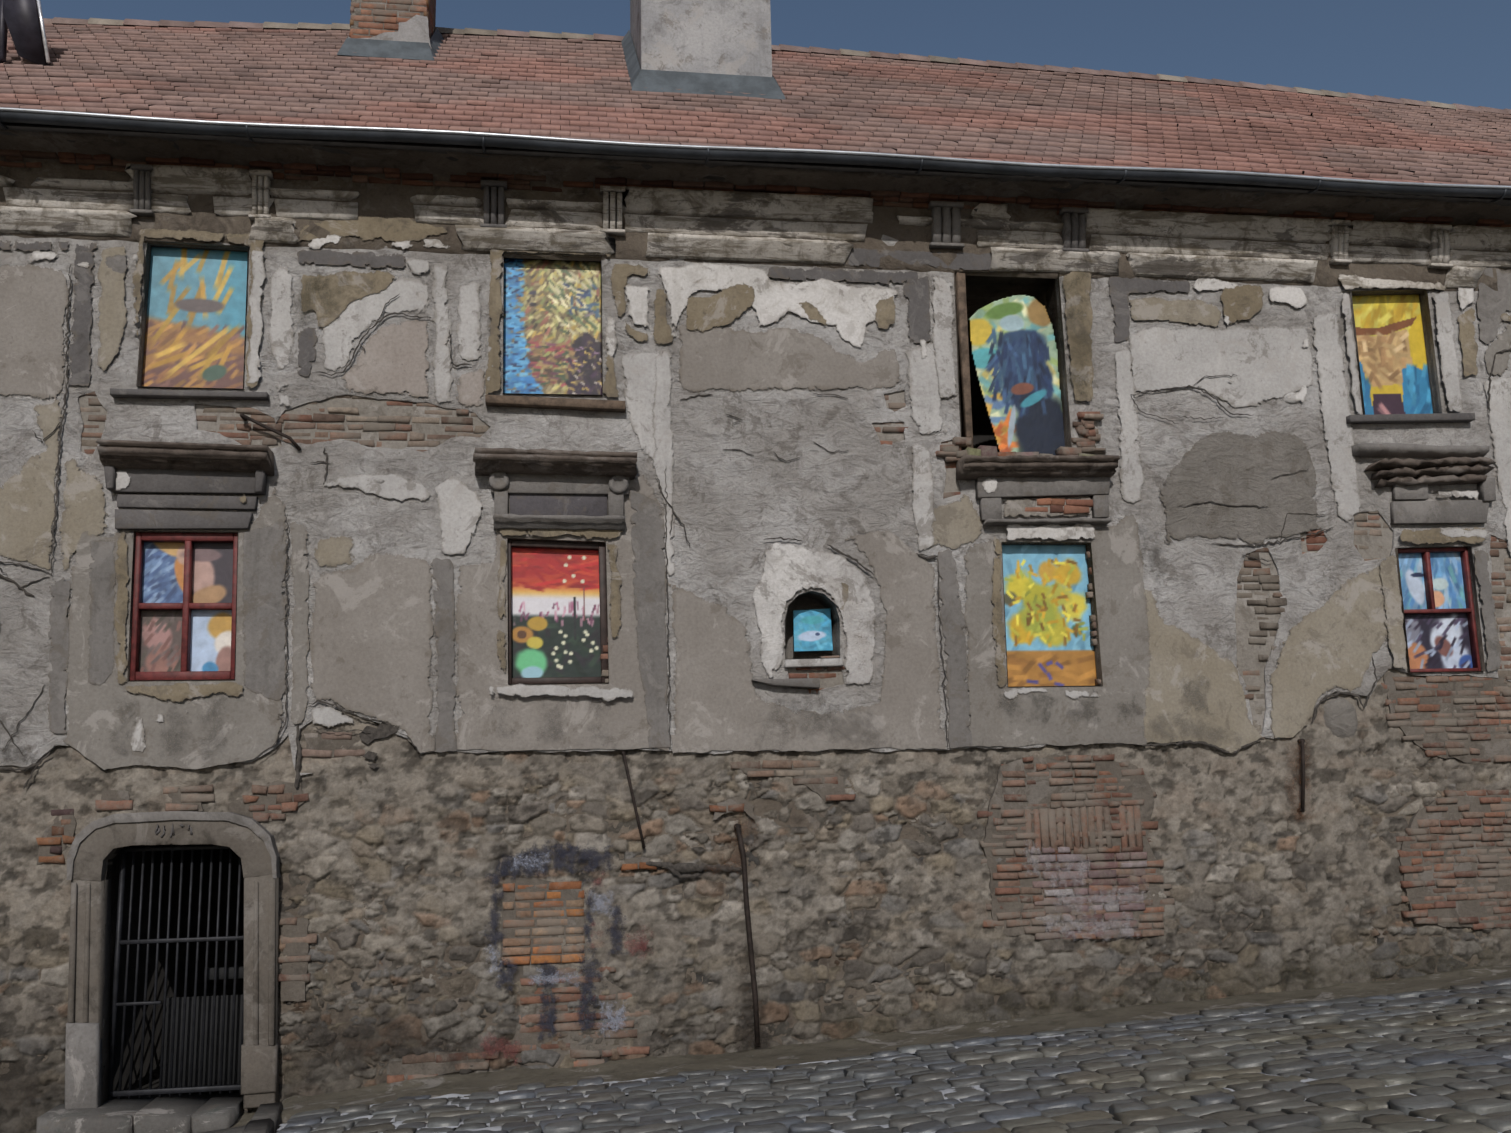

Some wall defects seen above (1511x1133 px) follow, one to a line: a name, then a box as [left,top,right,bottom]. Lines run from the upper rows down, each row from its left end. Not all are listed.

spalling [195,395,490,452]
crack [319,294,470,376]
flaking render [605,262,898,357]
crack [1487,348,1511,412]
spalling [1235,548,1287,746]
spalling [1381,536,1511,763]
crack [0,686,50,789]
spalling [301,706,400,769]
spalling [36,804,77,864]
spalling [163,780,309,822]
spalling [1396,789,1511,930]
spalling [387,877,660,1083]